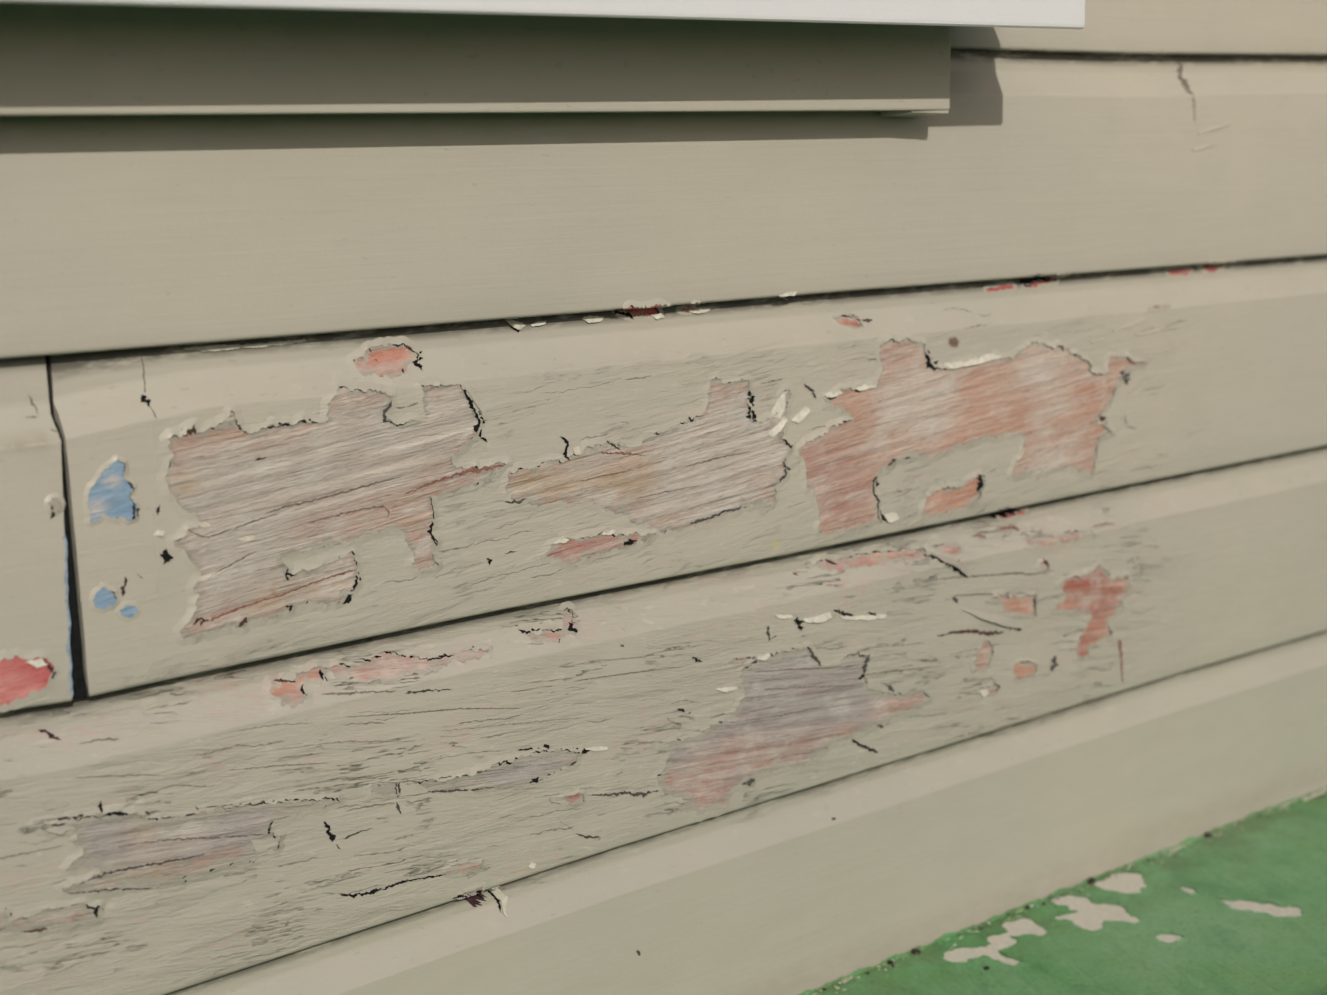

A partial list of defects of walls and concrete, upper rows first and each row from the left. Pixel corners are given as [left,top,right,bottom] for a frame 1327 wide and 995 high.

peeling [582,298,711,323]
peeling [43,493,66,518]
peeling [82,311,1148,650]
peeling [938,507,1136,698]
peeling [0,647,61,713]
peeling [262,641,494,715]
peeling [652,609,939,822]
peeling [411,741,587,809]
peeling [0,789,345,942]
peeling [340,858,508,917]
spalling [933,870,1190,970]
spalling [1174,885,1312,921]